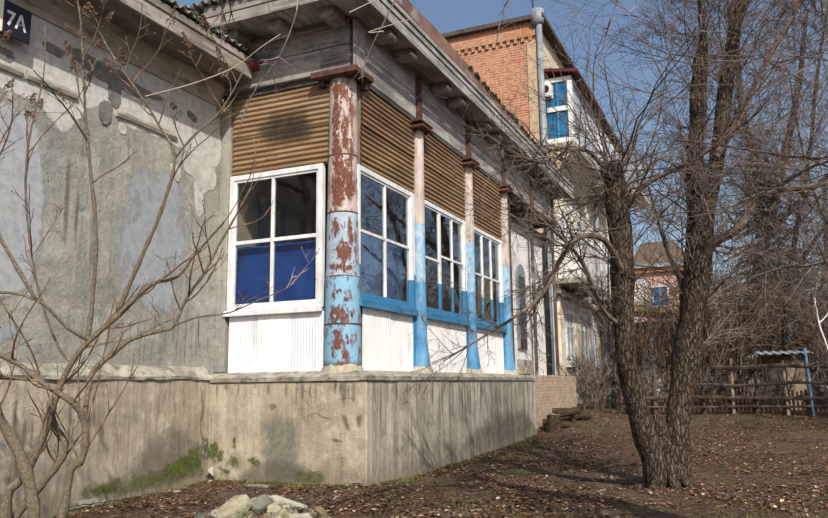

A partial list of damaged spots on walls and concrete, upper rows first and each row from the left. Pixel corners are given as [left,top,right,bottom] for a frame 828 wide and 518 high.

flaking render [0,14,221,217]
corrosion [330,79,358,278]
corrosion [330,288,353,366]
leakage [268,420,295,471]